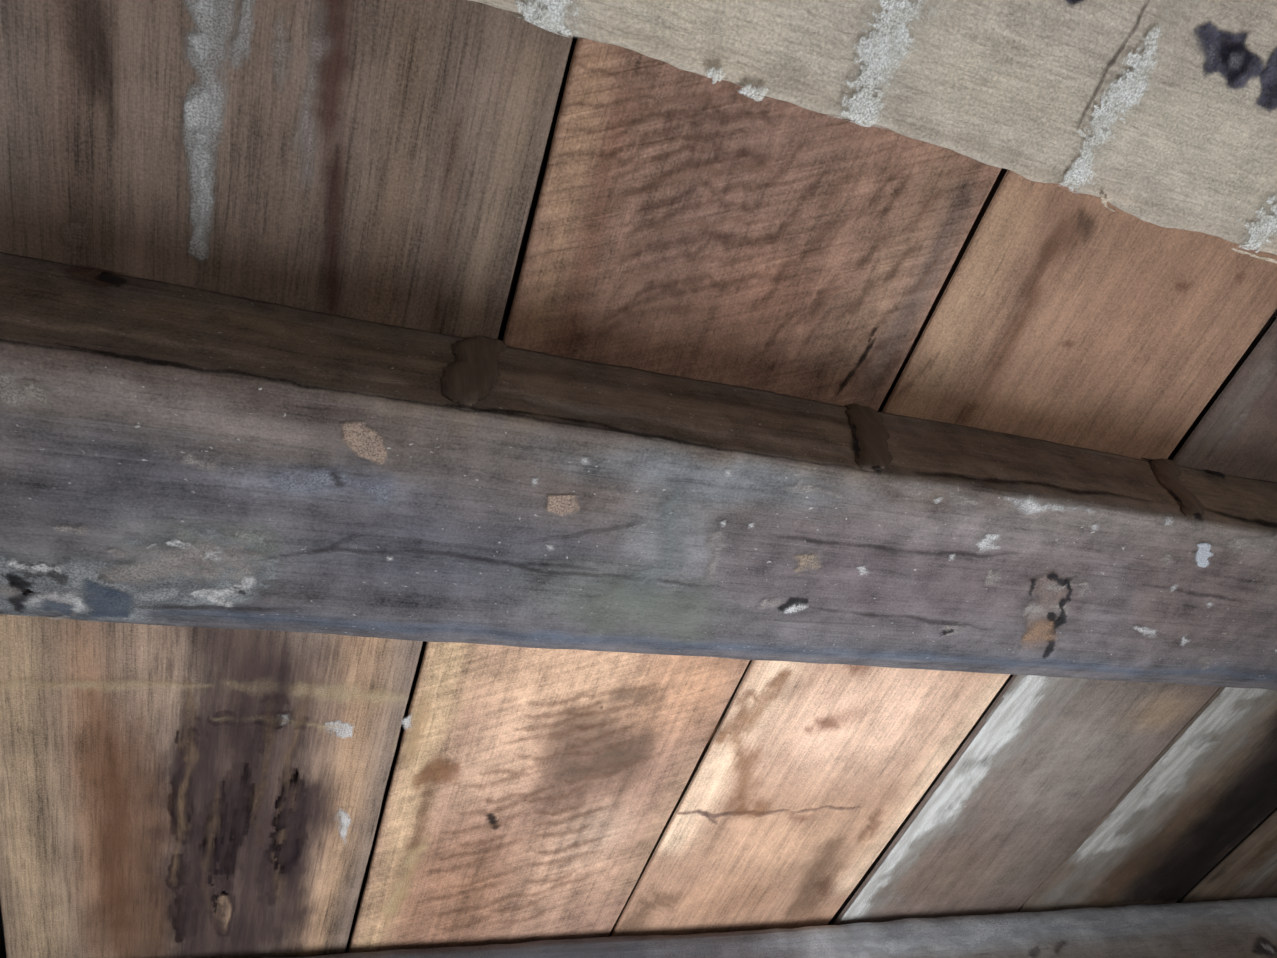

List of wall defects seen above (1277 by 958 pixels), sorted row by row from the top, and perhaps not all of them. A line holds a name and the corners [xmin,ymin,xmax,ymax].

crack [1081,1,1149,120]
water stain [1196,22,1277,111]
peeling [0,527,278,622]
water stain [174,627,333,956]
crack [679,807,854,823]
water stain [842,675,1046,920]
water stain [1047,689,1277,903]